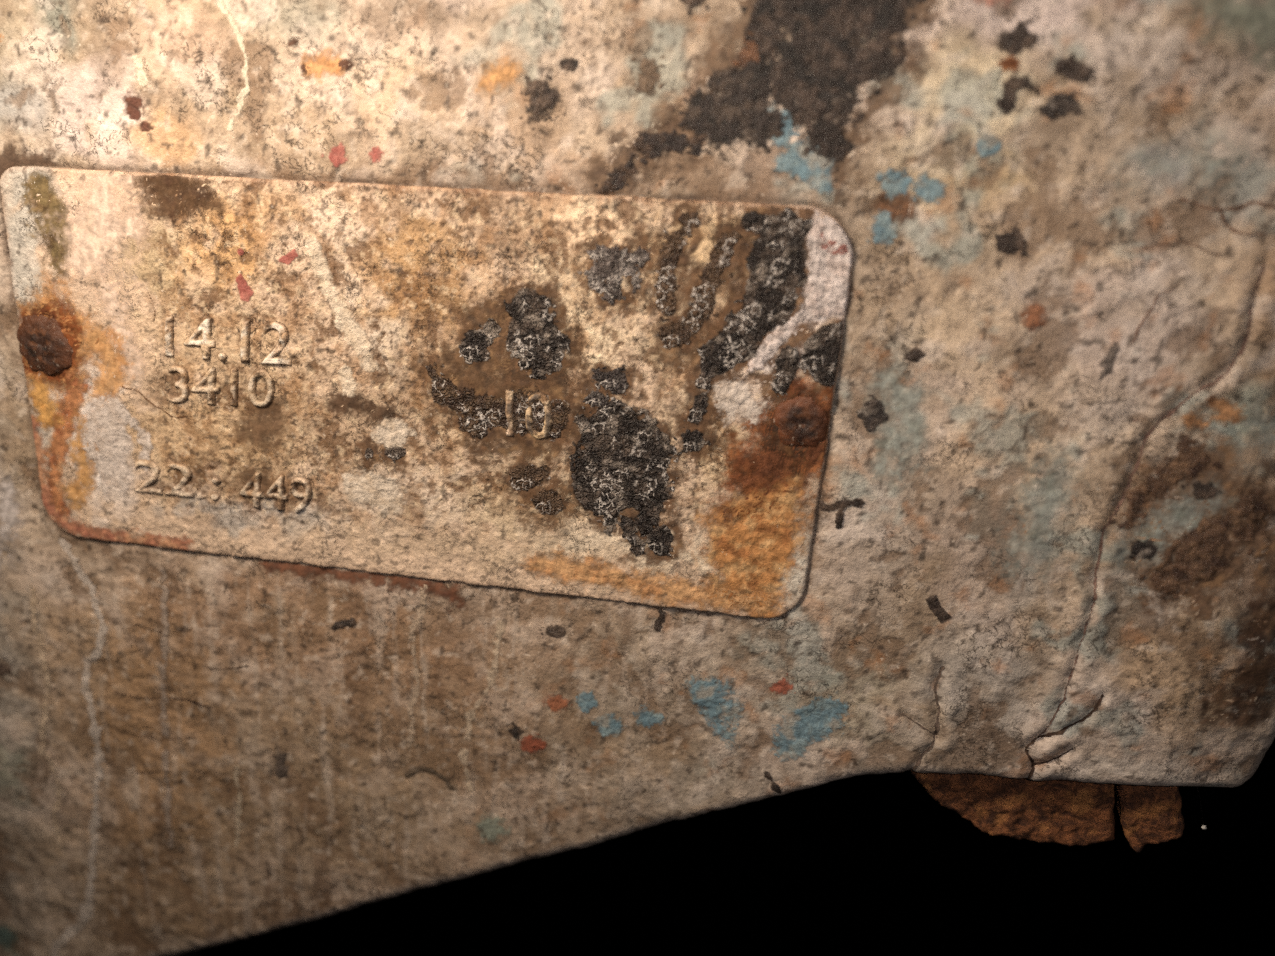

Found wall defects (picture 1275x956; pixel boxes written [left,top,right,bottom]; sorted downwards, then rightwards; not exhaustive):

rust [17,280,194,550]
rust [526,377,834,618]
crack [1025,198,1275,779]
crack [902,666,945,771]